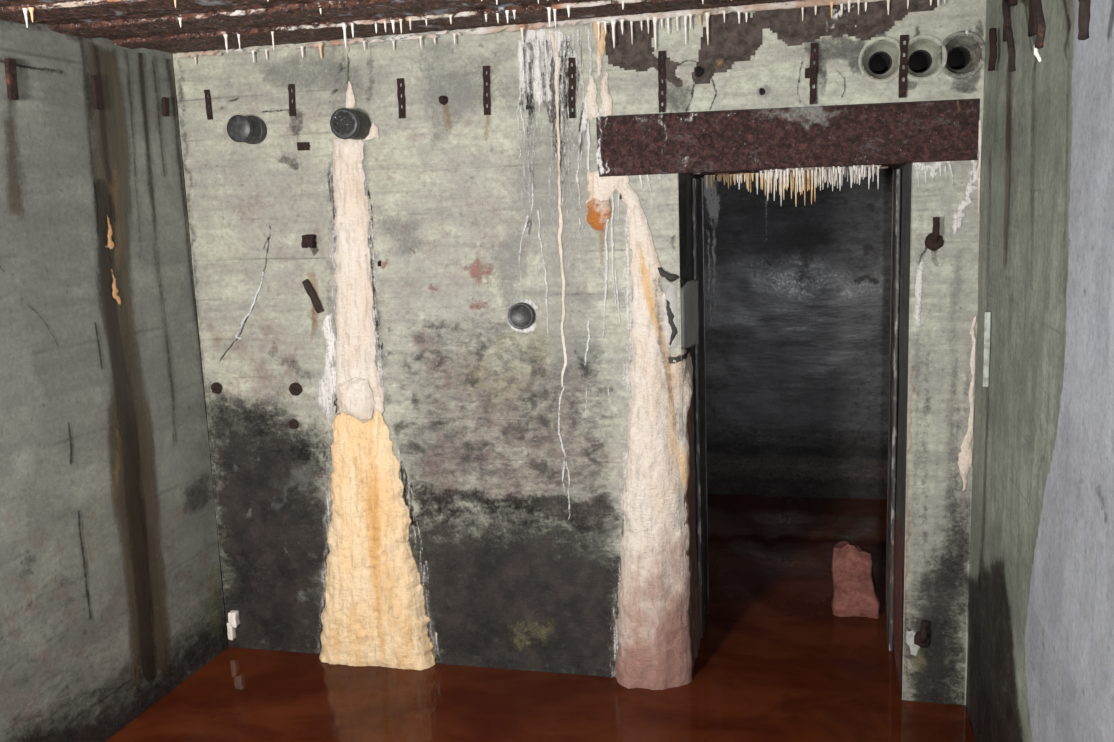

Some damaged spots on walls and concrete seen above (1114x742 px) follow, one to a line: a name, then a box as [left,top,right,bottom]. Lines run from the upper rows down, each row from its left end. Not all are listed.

spalling [605,0,937,87]
damp [953,70,979,93]
damp [5,99,20,212]
crack [220,227,271,361]
damp [914,262,924,326]
damp [17,0,890,742]
damp [905,316,1022,742]